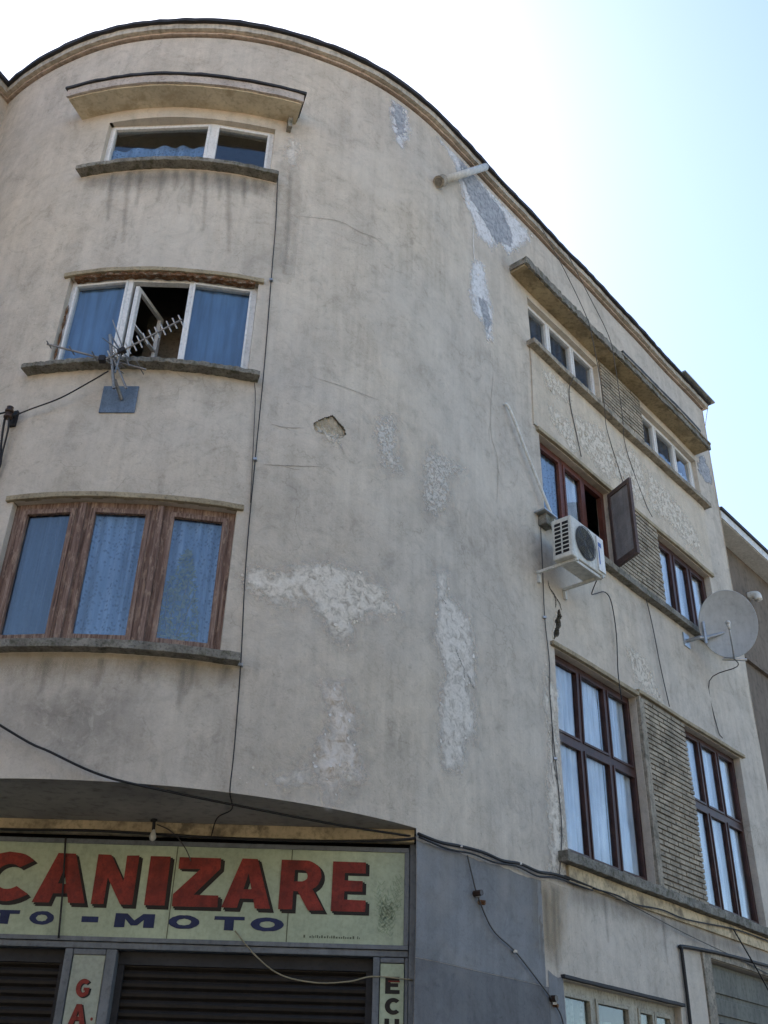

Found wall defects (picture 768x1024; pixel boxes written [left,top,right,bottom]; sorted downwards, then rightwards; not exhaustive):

peeling [391,101,410,148]
peeling [440,140,532,343]
spalling [314,415,346,449]
peeling [241,563,396,647]
crack [548,582,562,639]
peeling [435,571,476,774]
peeling [265,681,366,801]